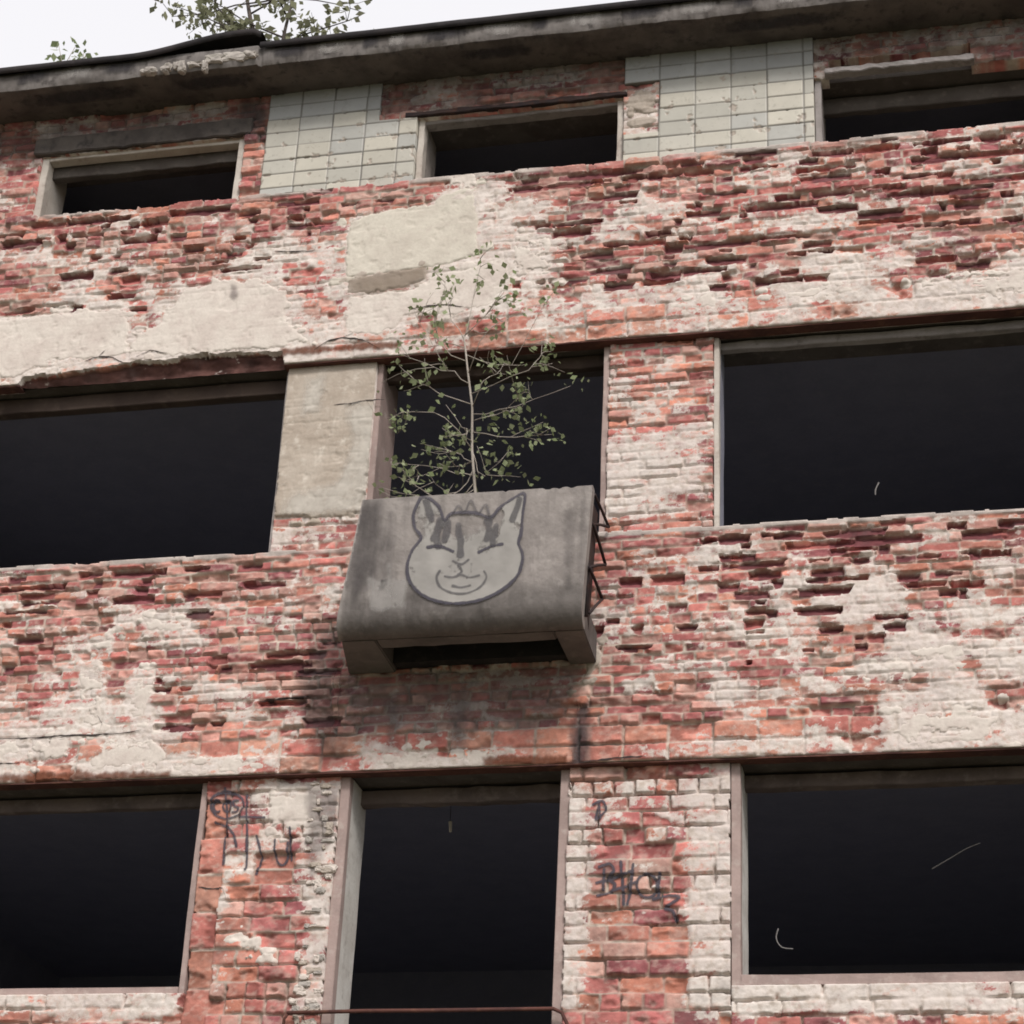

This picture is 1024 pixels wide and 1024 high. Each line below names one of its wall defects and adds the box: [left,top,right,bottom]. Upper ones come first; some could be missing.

spalling [140,50,258,77]
flaking render [276,133,1024,344]
crack [86,350,166,363]
flaking render [0,204,377,527]
crack [314,333,378,350]
spalling [240,562,287,592]
spalling [617,572,687,589]
spalling [698,511,1024,747]
spalling [0,567,263,781]
spalling [247,641,344,679]
spalling [566,618,655,697]
spalling [257,699,344,730]